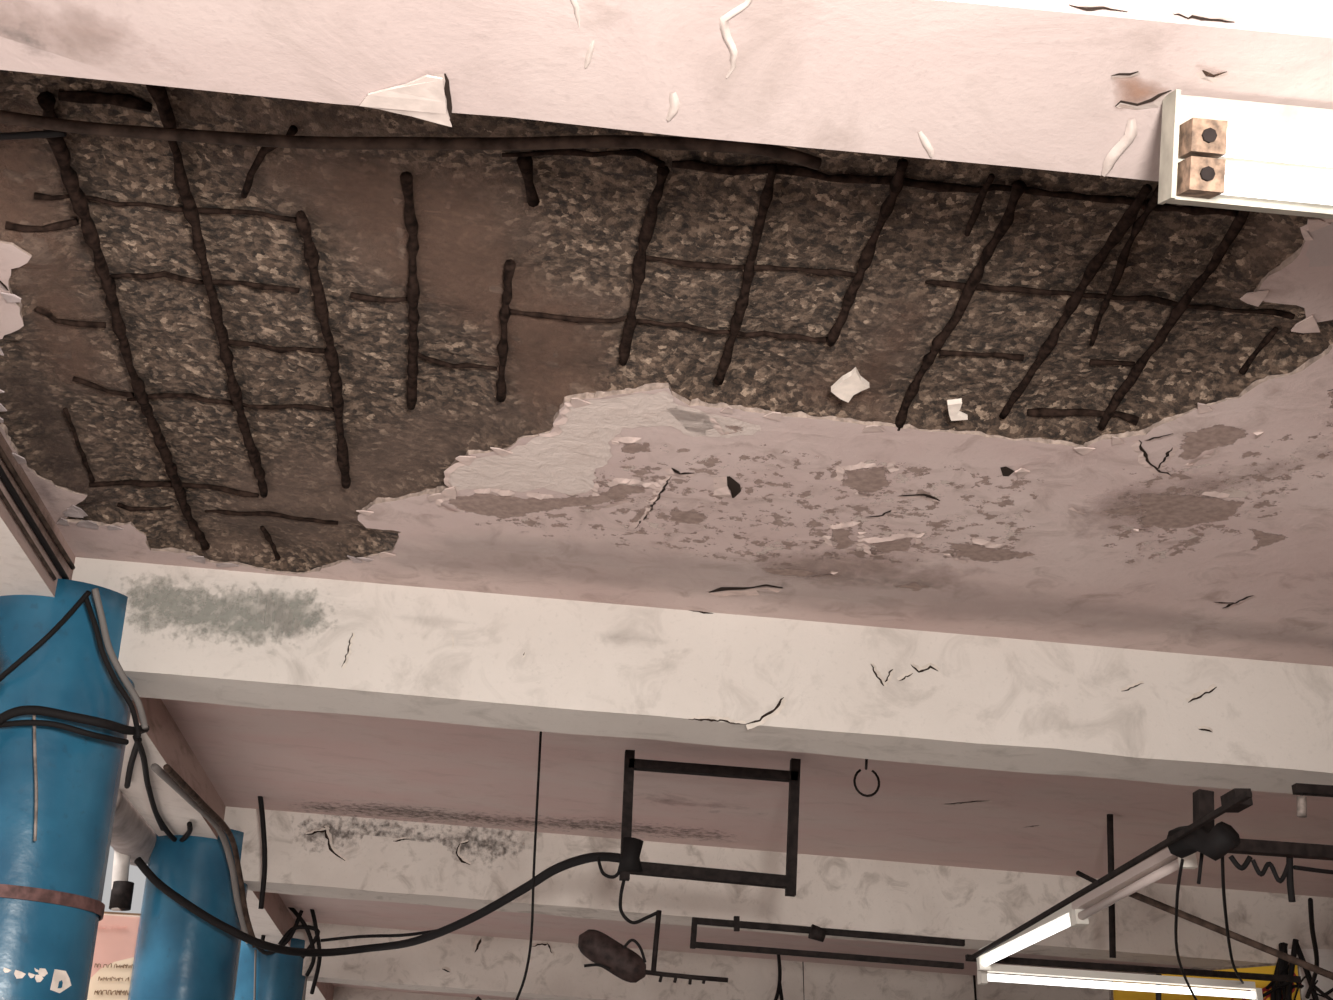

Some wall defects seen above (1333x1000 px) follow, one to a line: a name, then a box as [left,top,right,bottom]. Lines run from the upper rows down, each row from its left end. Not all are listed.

spalling [0,70,1333,578]
corrosion [0,432,59,556]
water stain [130,579,322,641]
peeling [3,968,48,982]